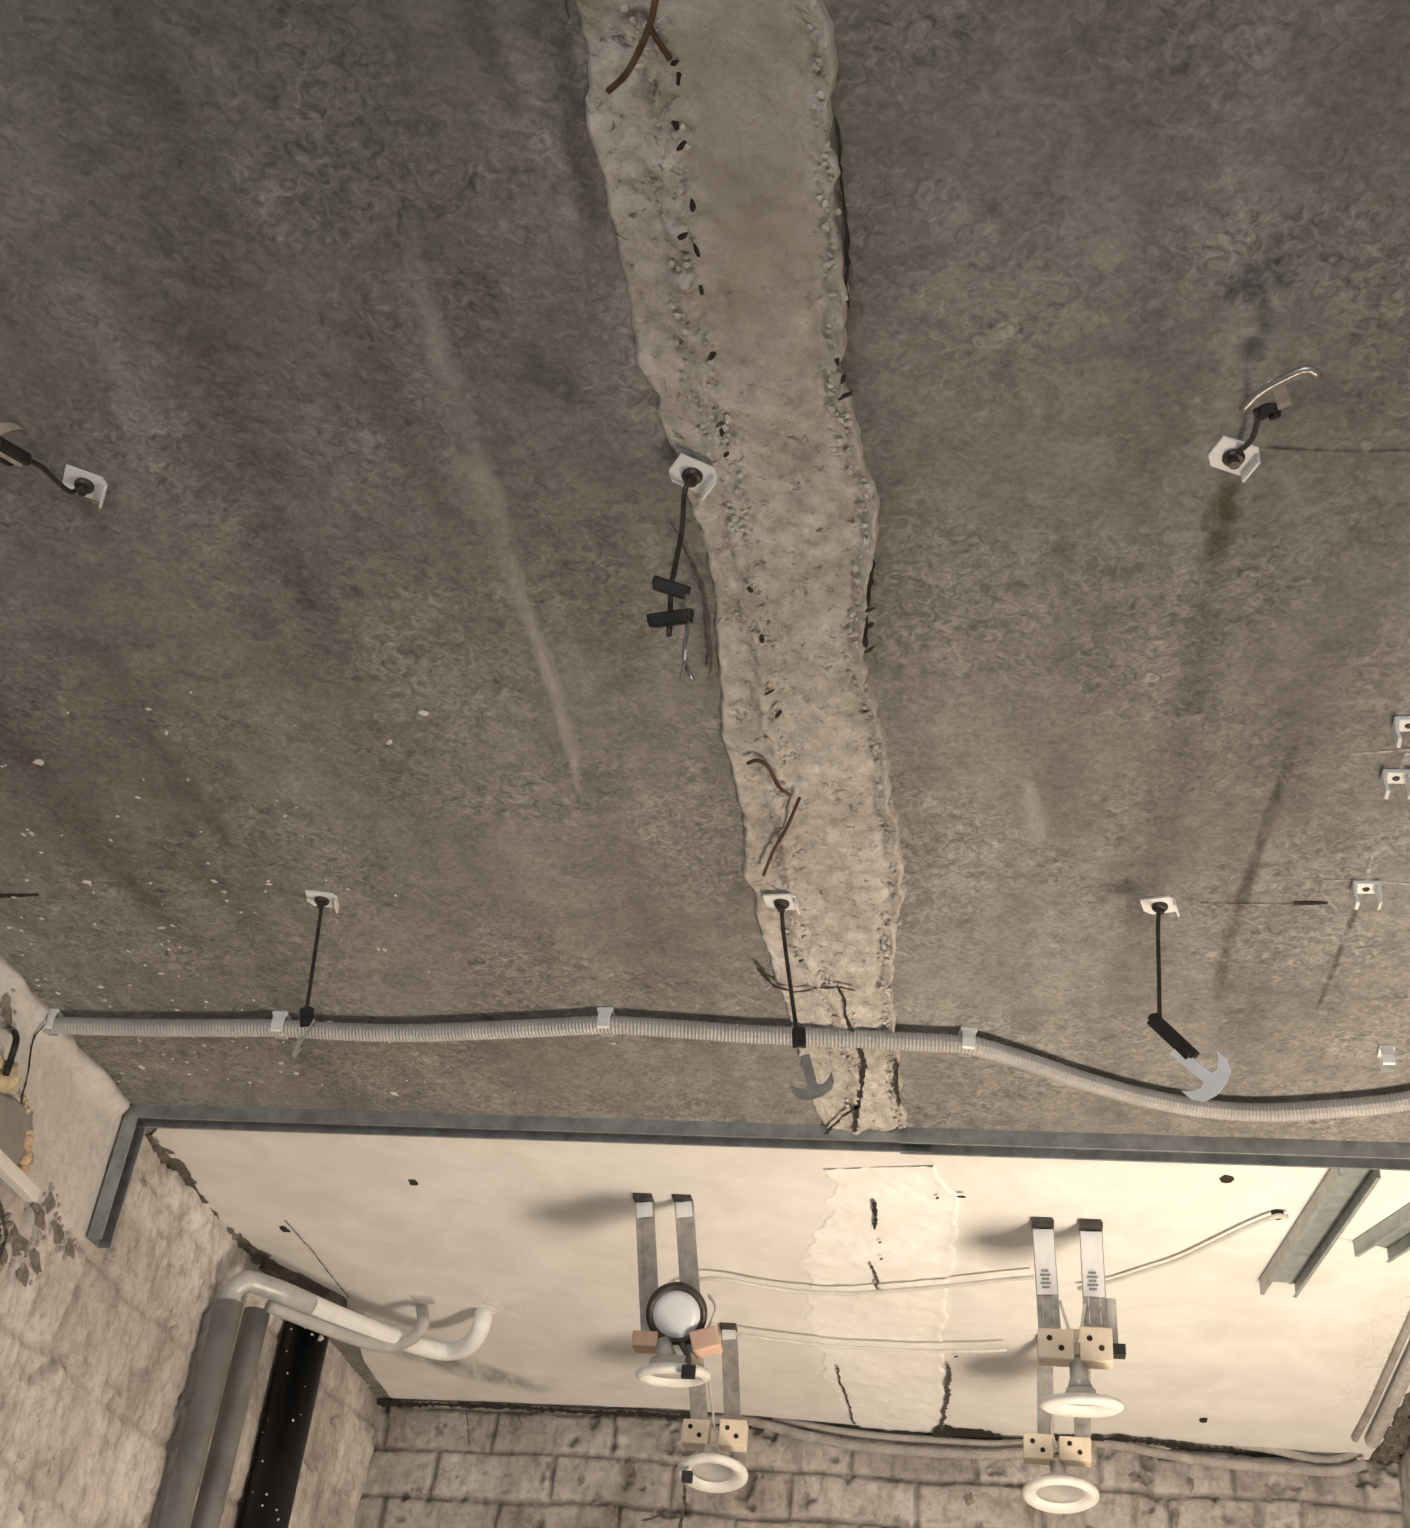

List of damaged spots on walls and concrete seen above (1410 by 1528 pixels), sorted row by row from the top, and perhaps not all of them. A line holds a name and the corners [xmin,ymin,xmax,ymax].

spalling [670,60,682,86]
spalling [671,120,687,151]
spalling [677,232,700,257]
peeling [812,91,901,1032]
spalling [0,990,17,1029]
crack [756,968,901,1134]
spalling [0,1182,79,1287]
crack [870,1201,879,1290]
crack [836,1367,856,1425]